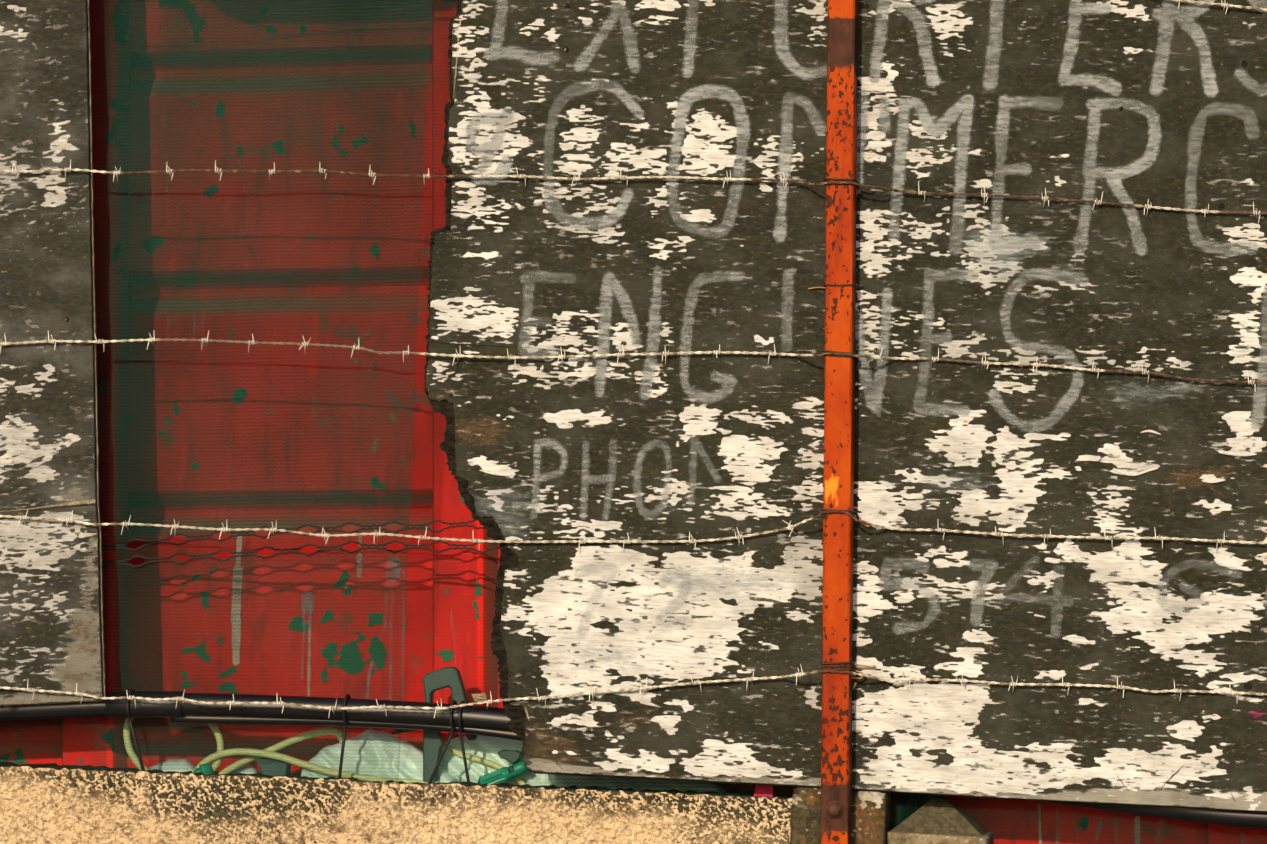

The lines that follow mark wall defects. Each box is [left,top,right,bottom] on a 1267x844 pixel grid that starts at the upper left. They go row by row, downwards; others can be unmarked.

peeling [0,99,78,215]
peeling [444,0,828,267]
peeling [857,54,910,163]
peeling [869,0,974,57]
peeling [905,120,981,178]
peeling [430,287,671,398]
peeling [855,204,1191,394]
peeling [1221,267,1267,379]
peeling [0,413,94,620]
peeling [468,397,824,805]
peeling [852,539,1262,810]
peeling [854,410,1267,702]